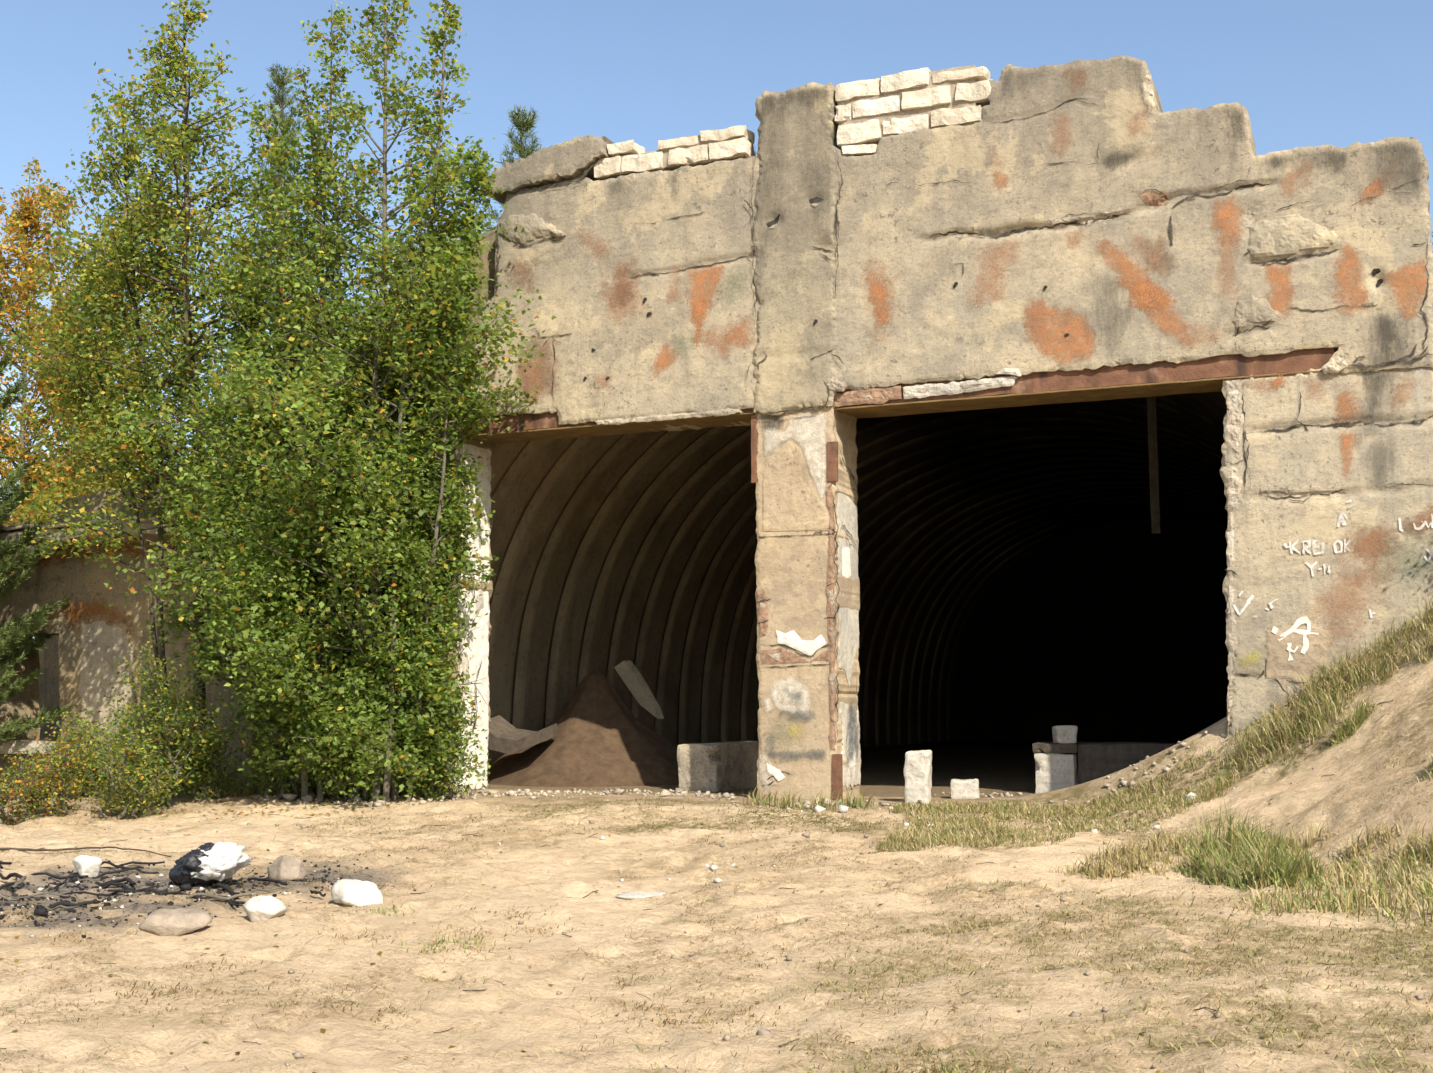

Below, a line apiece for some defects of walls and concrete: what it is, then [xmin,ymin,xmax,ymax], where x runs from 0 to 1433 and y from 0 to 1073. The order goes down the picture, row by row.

crack [920,180,1308,246]
crack [1353,180,1420,205]
corrosion [689,266,749,350]
corrosion [1027,301,1094,363]
corrosion [1101,244,1212,342]
crack [1244,249,1340,265]
corrosion [1335,246,1368,312]
corrosion [1383,262,1427,317]
spalling [756,368,1021,790]
peeling [787,804,849,813]